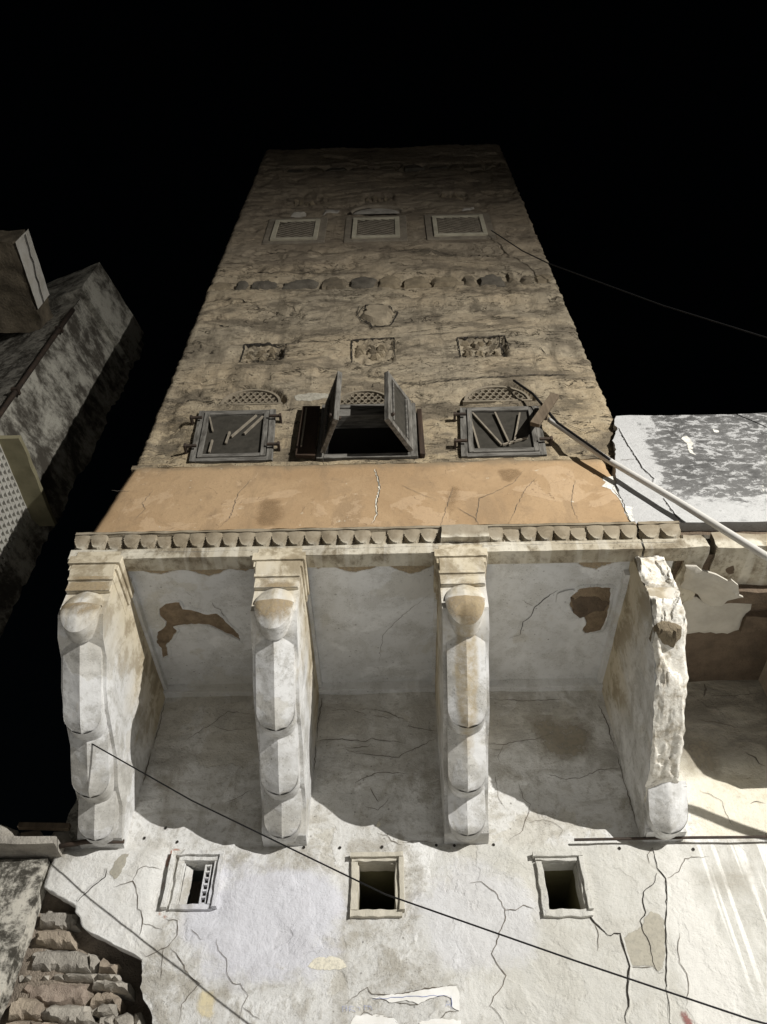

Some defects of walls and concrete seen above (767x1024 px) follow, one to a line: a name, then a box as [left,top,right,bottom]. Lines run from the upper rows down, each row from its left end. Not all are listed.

crack [372,469,381,522]
crack [406,472,532,524]
spalling [153,600,245,659]
spalling [556,584,616,635]
crack [314,700,436,845]
crack [495,735,562,841]
crack [551,707,637,826]
peeling [110,854,129,879]
crack [76,866,259,1021]
peeling [371,986,461,1024]
crack [471,881,531,1023]
crack [590,847,706,1024]